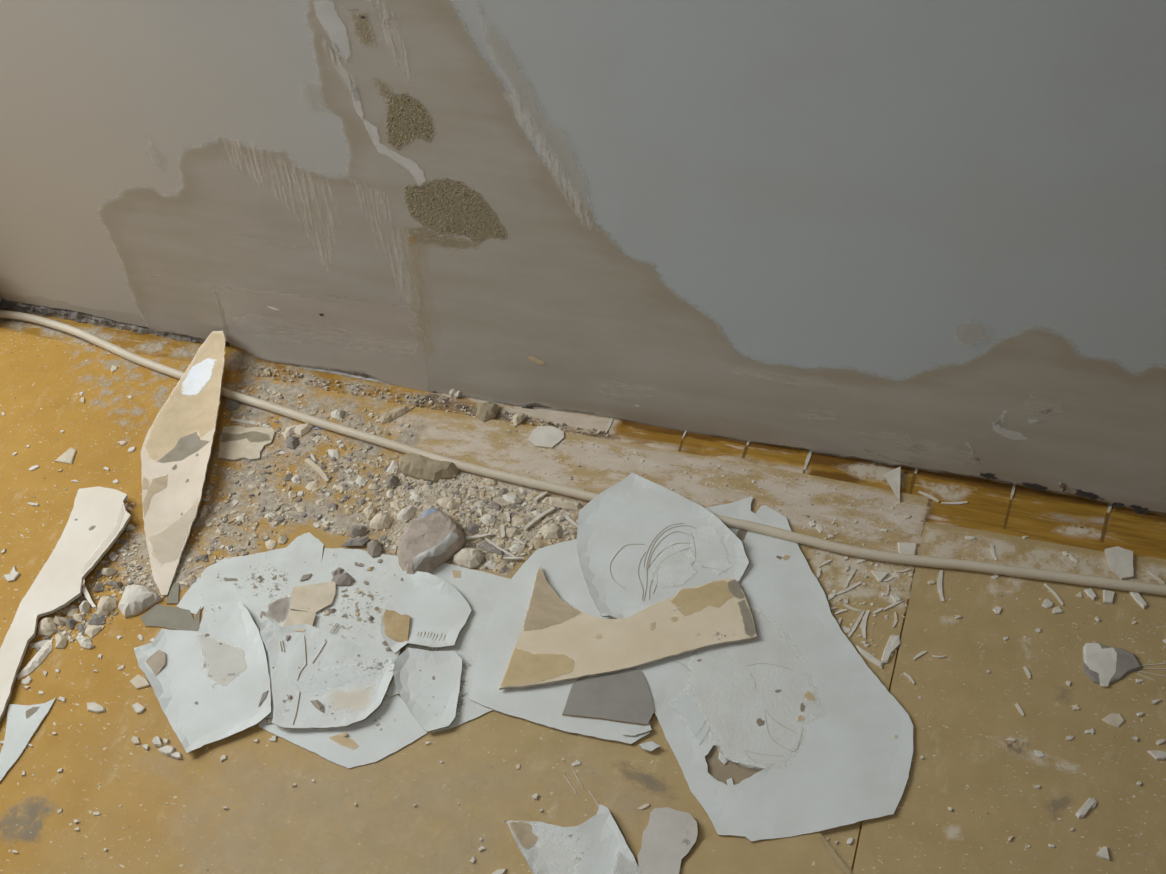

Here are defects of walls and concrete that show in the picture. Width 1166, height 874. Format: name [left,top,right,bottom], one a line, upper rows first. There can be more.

flaking render [0,0,1166,514]